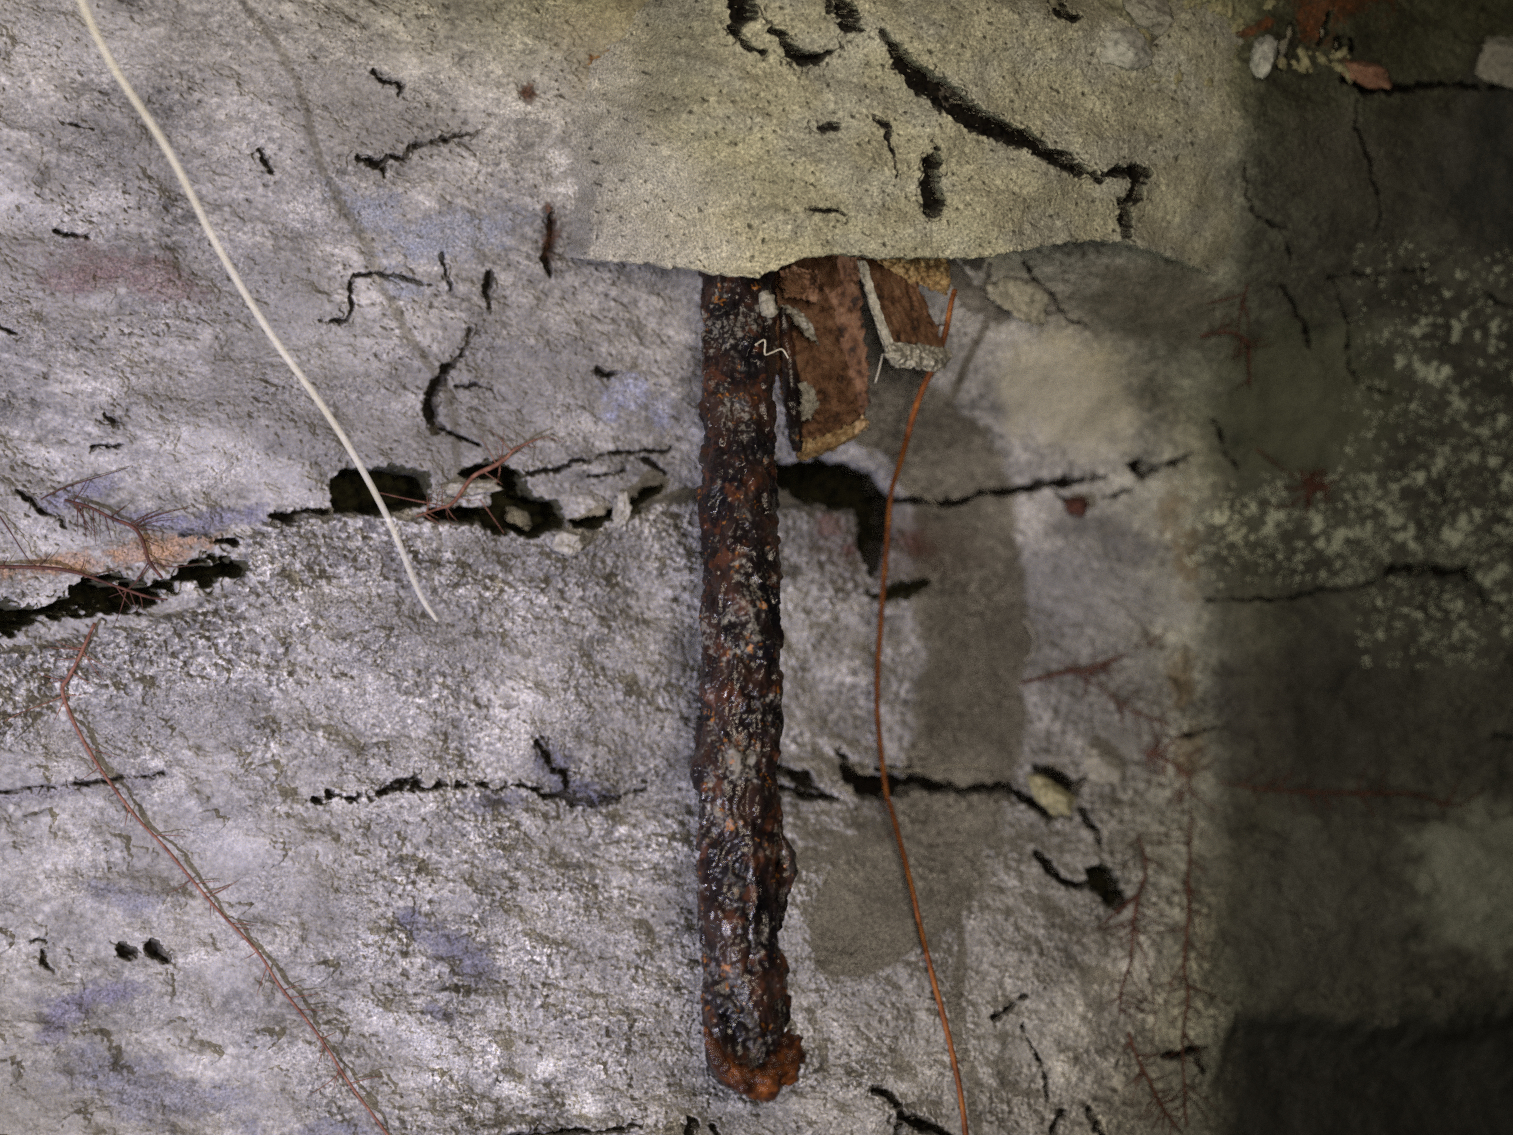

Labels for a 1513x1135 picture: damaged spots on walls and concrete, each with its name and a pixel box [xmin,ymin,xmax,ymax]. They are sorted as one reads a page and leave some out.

crack [722,0,1156,241]
crack [1243,74,1507,394]
corrosion [777,265,824,304]
crack [15,489,67,529]
crack [89,412,123,453]
crack [524,445,672,478]
crack [893,419,1240,515]
crack [0,508,329,638]
crack [1203,554,1505,615]
crack [776,743,1104,892]
corrosion [743,832,798,947]
corrosion [703,1026,731,1075]